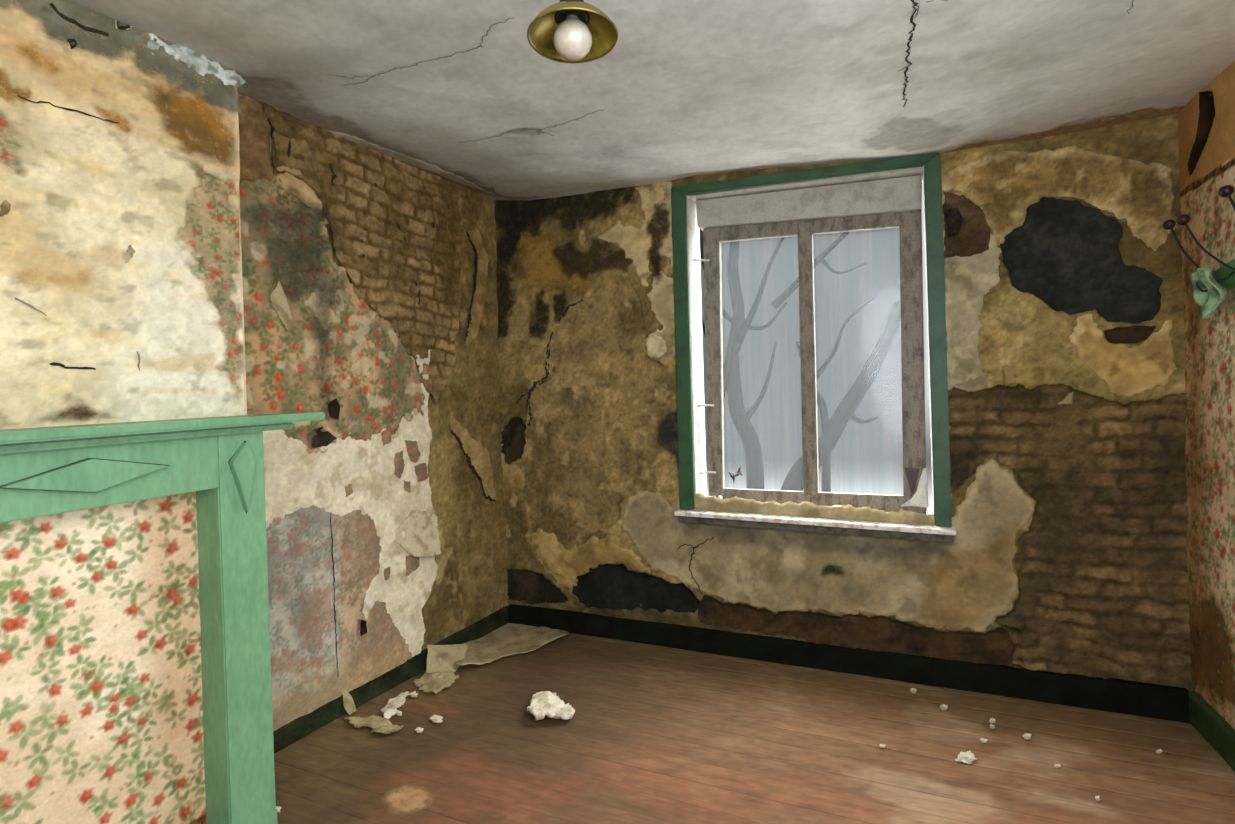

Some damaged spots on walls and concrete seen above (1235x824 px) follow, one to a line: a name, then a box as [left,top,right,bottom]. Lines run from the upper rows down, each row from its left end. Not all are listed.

crack [327,18,513,85]
crack [898,0,948,107]
spalling [0,200,11,217]
spalling [122,245,135,263]
leakage [494,186,636,338]
leakage [648,206,669,277]
spalling [50,362,96,370]
flaking render [147,33,495,657]
spalling [450,181,679,540]
flaking render [698,146,1193,692]